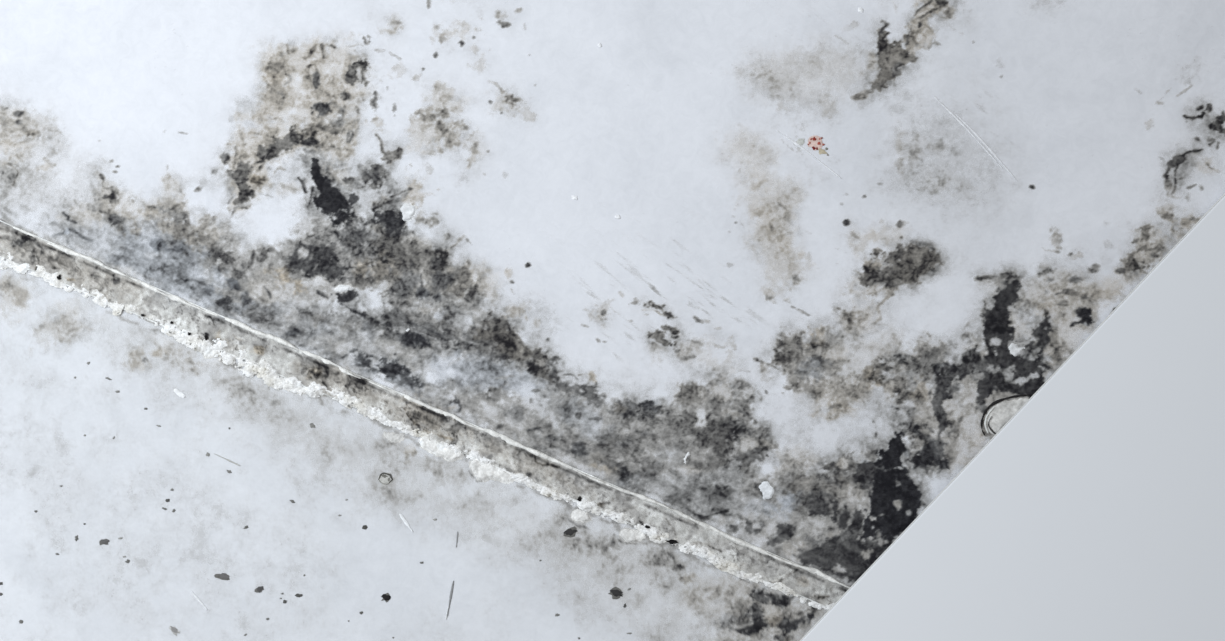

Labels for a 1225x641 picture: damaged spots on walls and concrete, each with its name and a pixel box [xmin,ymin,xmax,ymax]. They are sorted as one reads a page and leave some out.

water stain [387,17,403,35]
water stain [413,23,478,80]
water stain [495,8,522,28]
water stain [1160,99,1225,200]
water stain [1114,204,1201,284]
water stain [0,35,1123,587]
water stain [512,484,827,641]